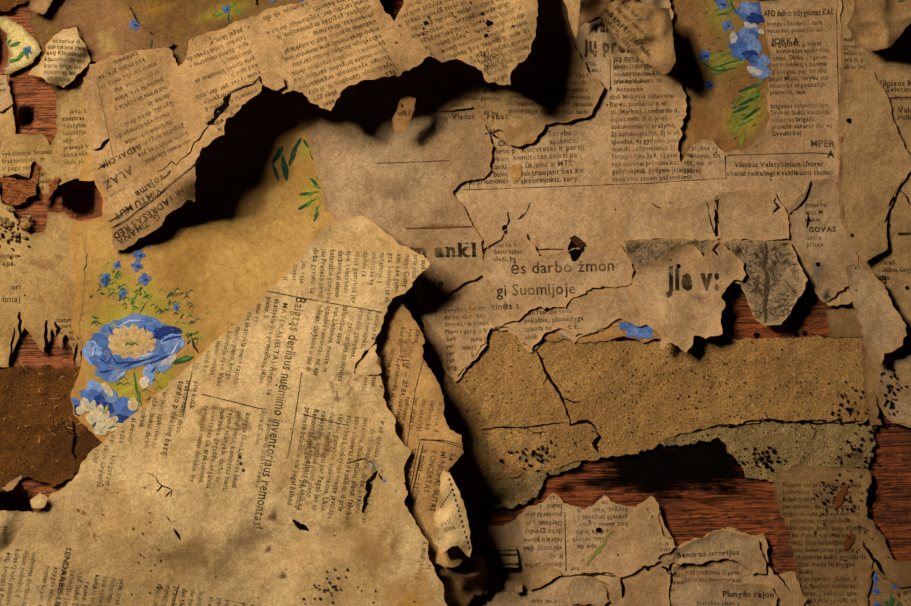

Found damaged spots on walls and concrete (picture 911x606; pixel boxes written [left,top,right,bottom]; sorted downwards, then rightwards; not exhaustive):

peeling [0,75,13,111]
peeling [392,96,416,133]
crack [482,349,601,452]
crack [693,413,863,438]